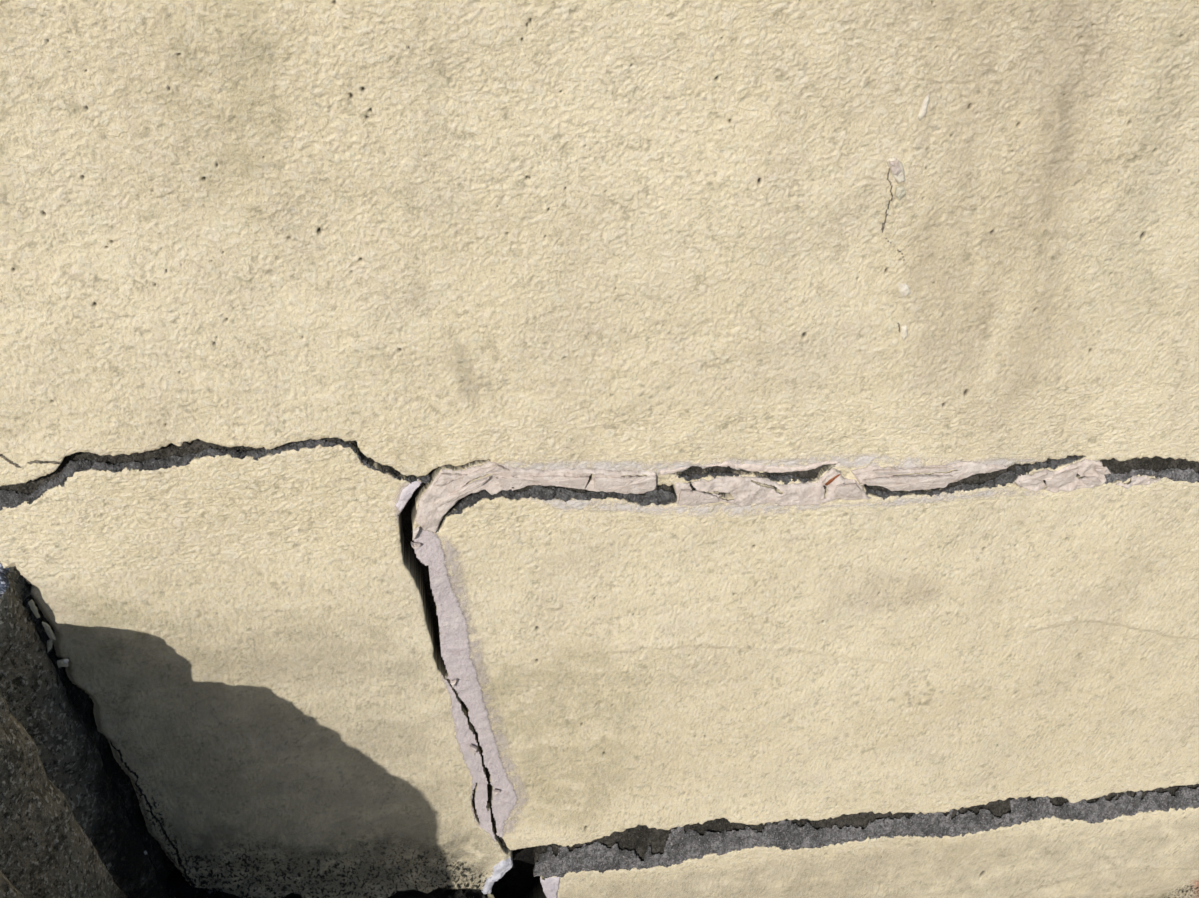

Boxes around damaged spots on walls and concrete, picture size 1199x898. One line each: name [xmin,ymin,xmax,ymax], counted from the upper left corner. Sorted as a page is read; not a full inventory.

crack [0,438,1199,888]
peeling [396,455,1161,549]